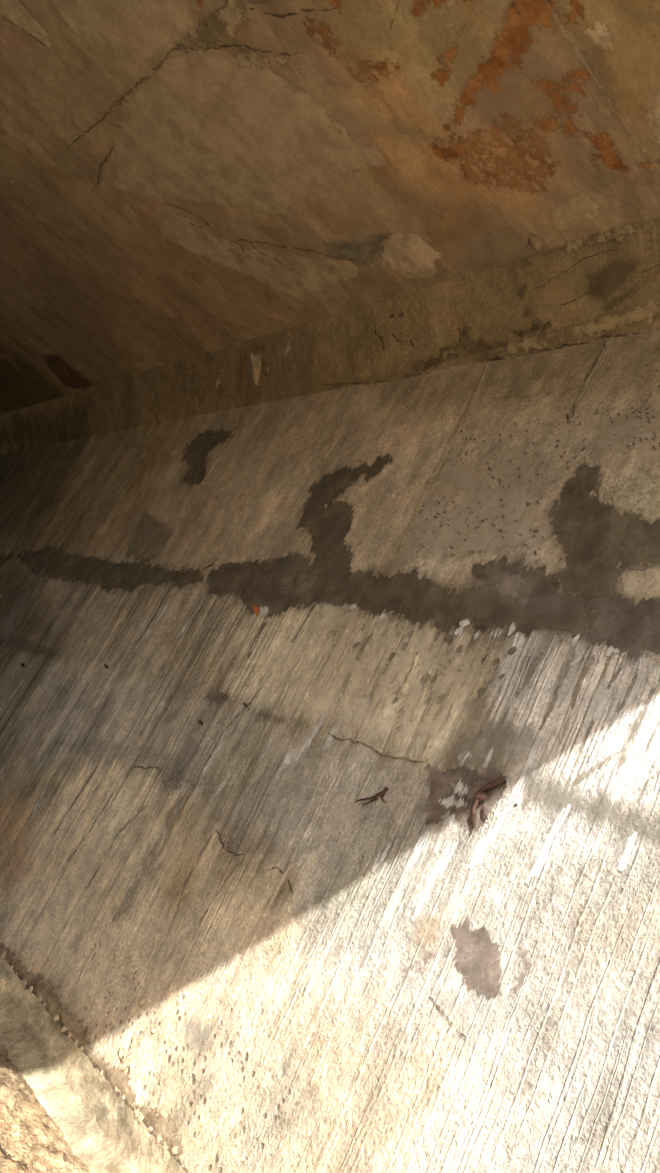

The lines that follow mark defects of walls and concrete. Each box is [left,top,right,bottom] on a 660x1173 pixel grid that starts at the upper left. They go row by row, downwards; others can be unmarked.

peeling [0,0,55,55]
spalling [176,0,290,72]
rust [303,0,400,83]
crack [67,0,337,190]
rust [431,0,652,193]
peeling [157,203,359,303]
peeling [381,230,443,280]
water stain [181,429,233,486]
water stain [0,453,660,927]
water stain [447,917,535,1000]